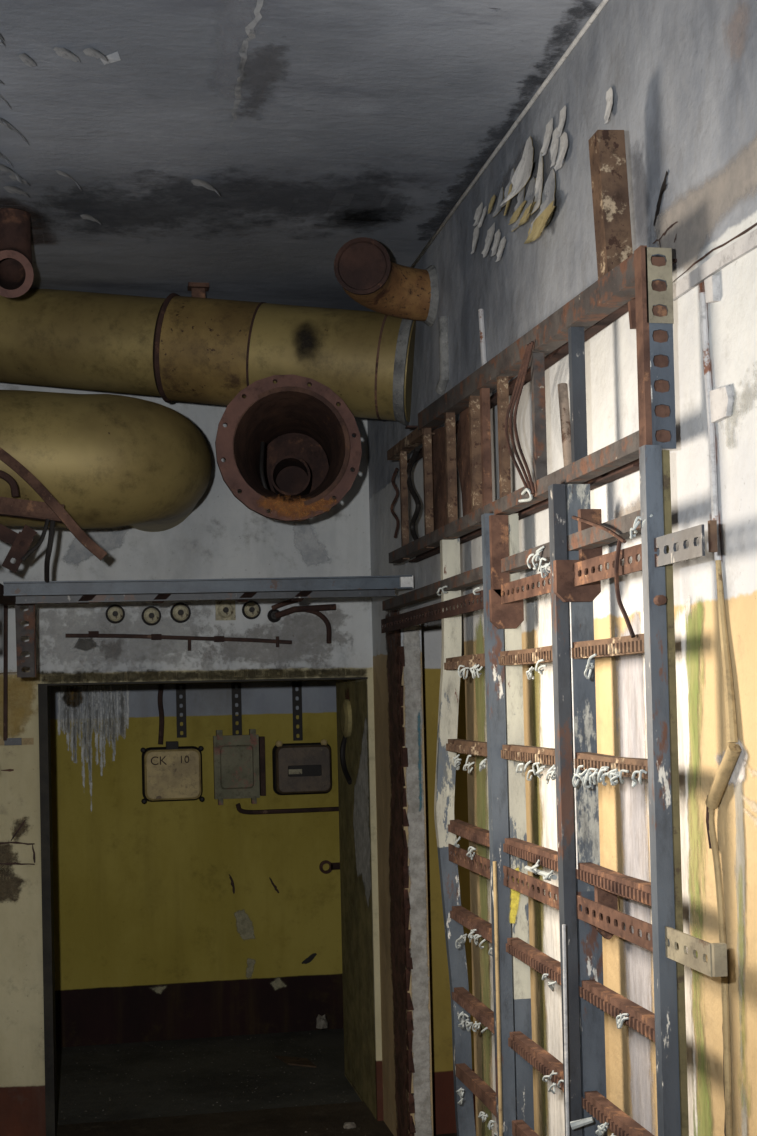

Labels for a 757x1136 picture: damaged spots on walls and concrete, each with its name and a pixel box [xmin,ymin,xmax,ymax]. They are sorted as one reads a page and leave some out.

leakage [419,0,595,240]
peeling [471,105,569,262]
peeling [604,87,613,124]
leakage [57,685,129,811]
spalling [385,609,433,1136]